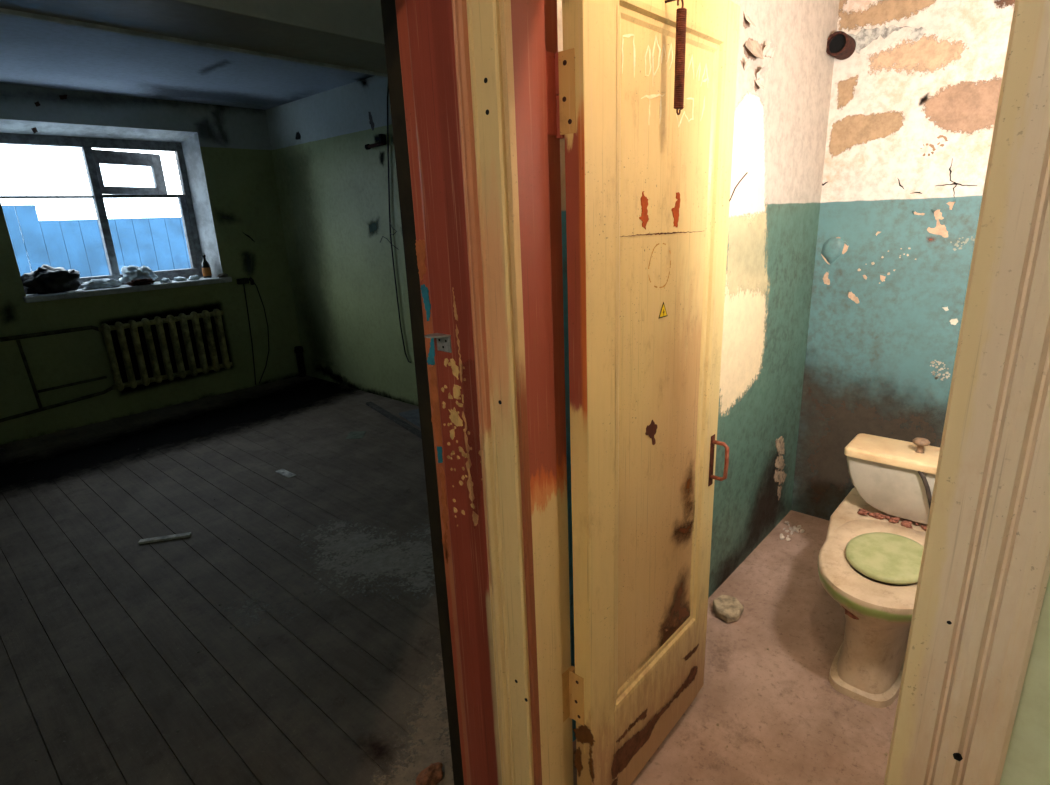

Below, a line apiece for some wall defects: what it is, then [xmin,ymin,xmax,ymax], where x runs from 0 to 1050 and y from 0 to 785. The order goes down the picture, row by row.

peeling [740,11,777,92]
spalling [848,25,926,54]
crack [898,158,977,198]
peeling [912,200,956,238]
peeling [415,239,431,321]
damp [930,360,950,381]
peeling [427,288,479,564]
spalling [774,436,787,500]
damp [718,366,946,588]